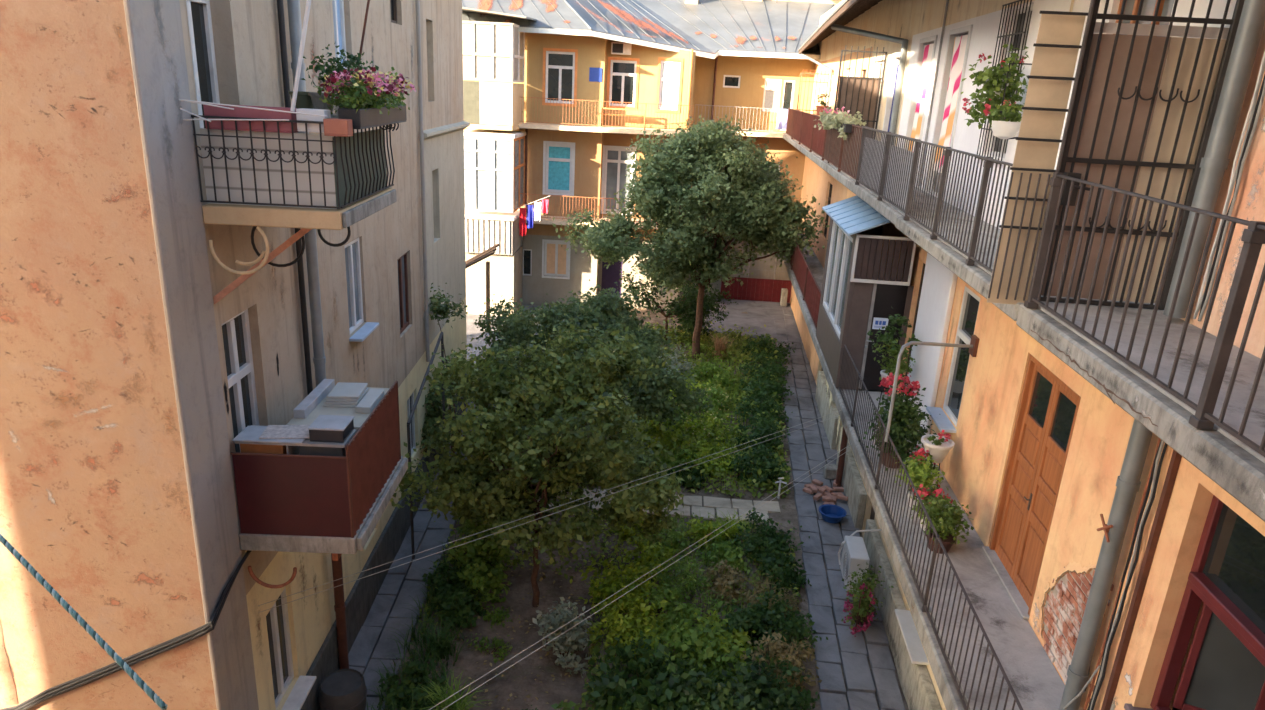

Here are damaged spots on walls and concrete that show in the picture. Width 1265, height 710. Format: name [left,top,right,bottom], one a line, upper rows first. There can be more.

corrosion [478,0,492,15]
corrosion [505,0,523,22]
spalling [1035,560,1097,684]
spalling [1080,574,1116,708]